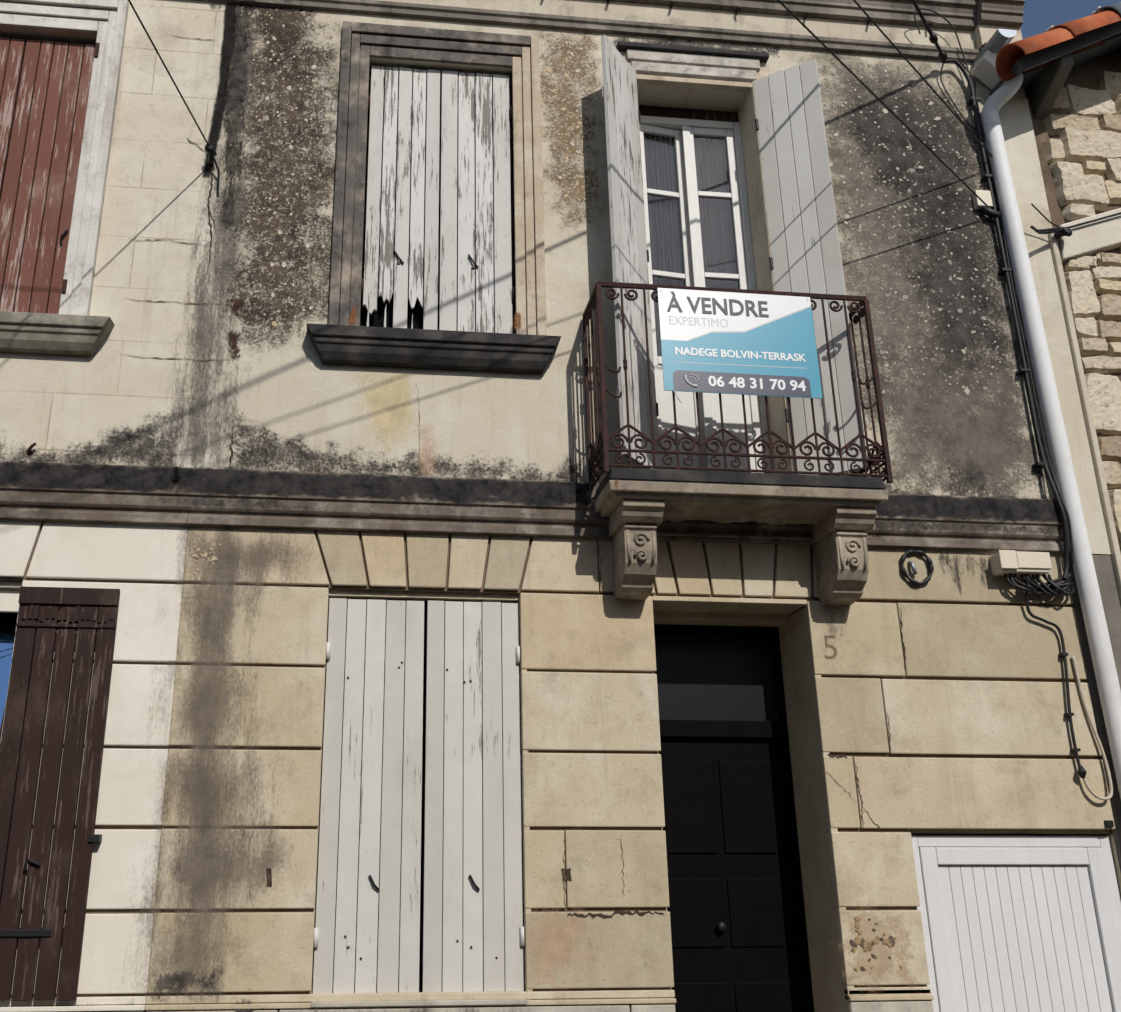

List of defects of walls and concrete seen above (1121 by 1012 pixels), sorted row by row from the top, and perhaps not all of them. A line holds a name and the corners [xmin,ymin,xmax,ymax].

damp [0,0,592,510]
damp [875,460,1063,536]
crack [899,609,907,672]
damp [154,528,287,1012]
crack [823,765,880,829]
spalling [850,917,903,971]